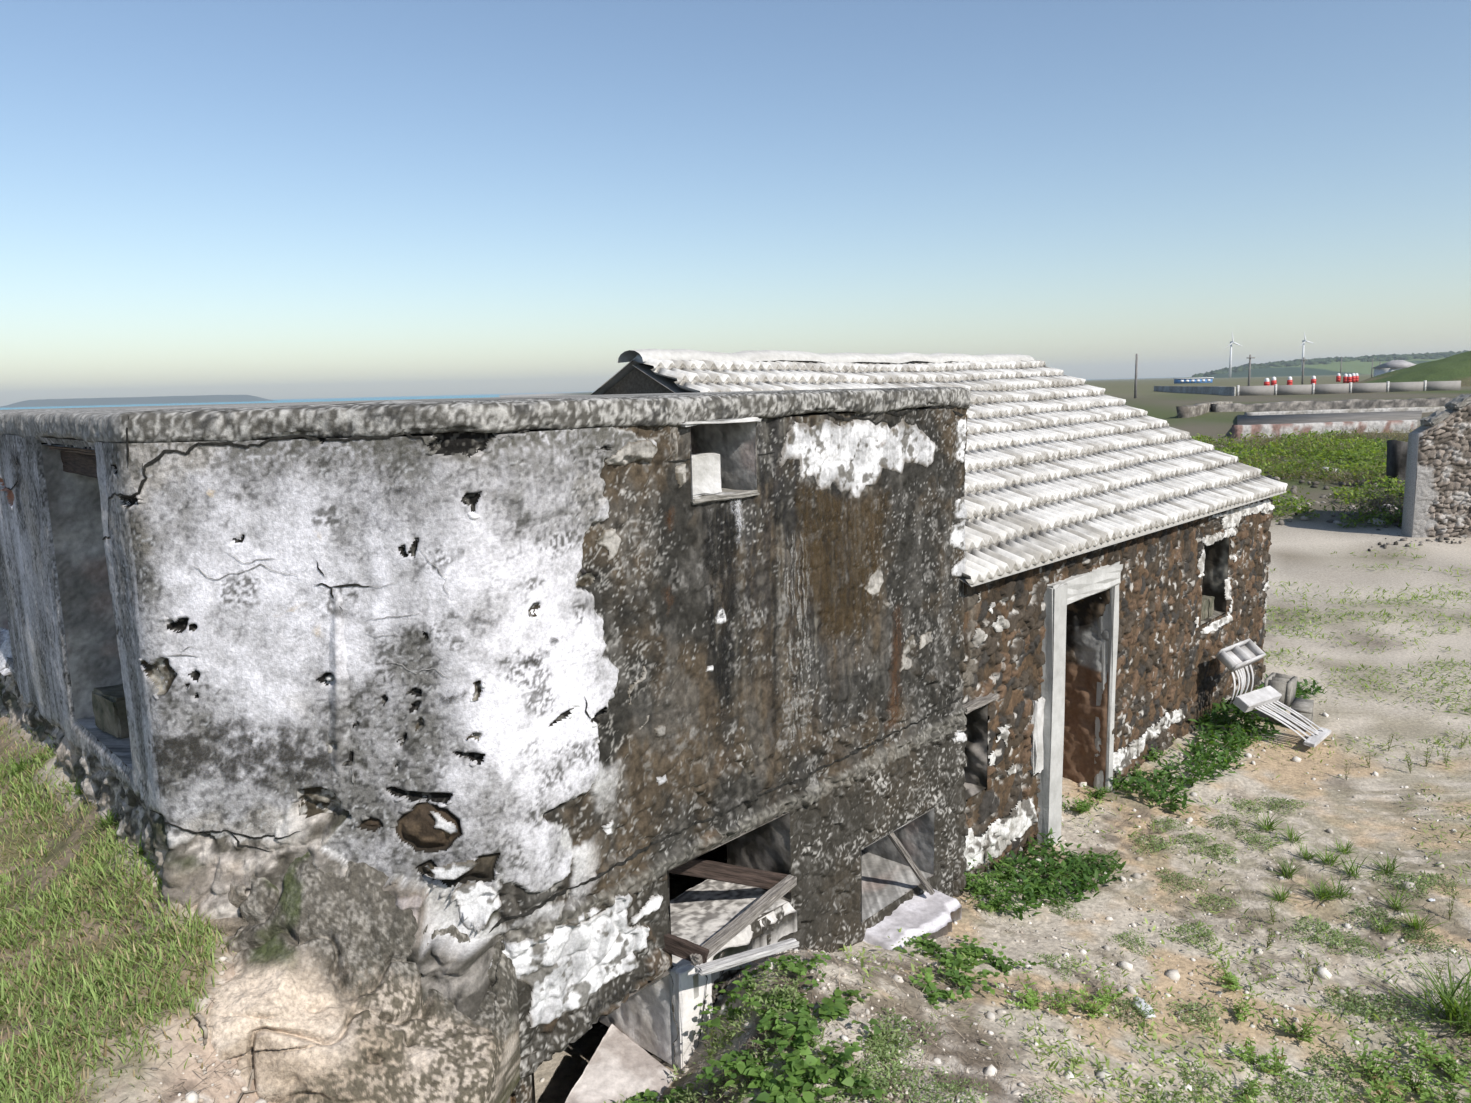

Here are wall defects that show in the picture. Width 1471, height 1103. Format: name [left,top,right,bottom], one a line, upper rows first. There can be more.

crack [102,416,426,540]
peeling [779,418,936,498]
peeling [949,497,967,578]
damp [703,501,741,708]
damp [773,484,886,739]
crack [150,810,301,852]
spalling [291,786,341,818]
spalling [354,787,502,933]
spalling [453,733,485,767]
spalling [550,702,608,728]
crack [489,697,963,933]
peeling [487,893,663,1028]